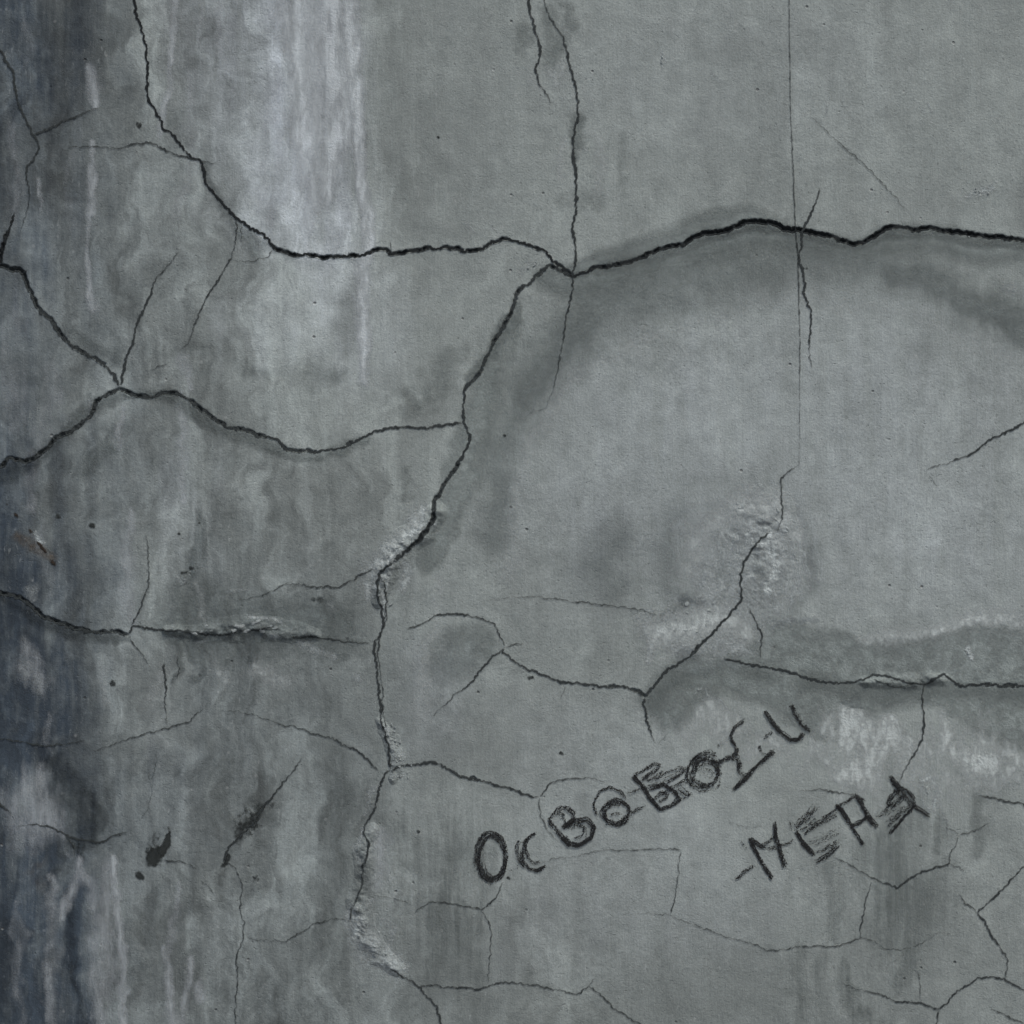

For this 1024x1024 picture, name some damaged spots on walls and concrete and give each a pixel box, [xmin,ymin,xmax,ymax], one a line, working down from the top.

water stain [275,0,375,384]
crack [0,0,1024,798]
water stain [417,208,1024,572]
peeling [231,616,279,639]
peeling [362,505,436,625]
water stain [647,611,1024,801]
water stain [14,756,101,922]
water stain [107,855,128,1024]
crack [350,770,389,919]
crack [392,887,641,1024]
crack [696,825,985,952]
crack [852,866,1024,1024]